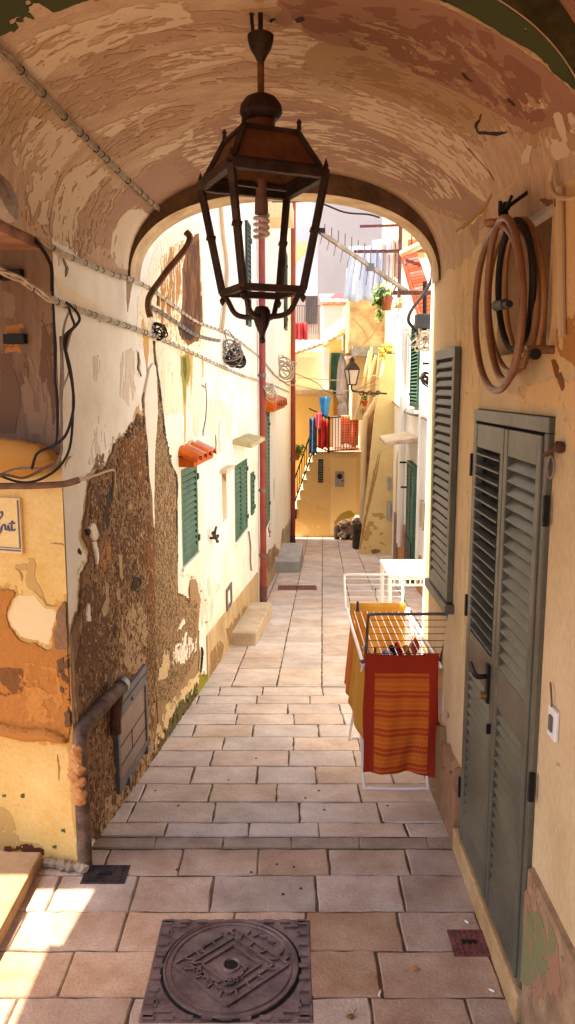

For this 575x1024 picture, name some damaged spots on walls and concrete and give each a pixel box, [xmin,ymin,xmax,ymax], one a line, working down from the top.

spalling [238,0,575,165]
peeling [0,350,208,843]